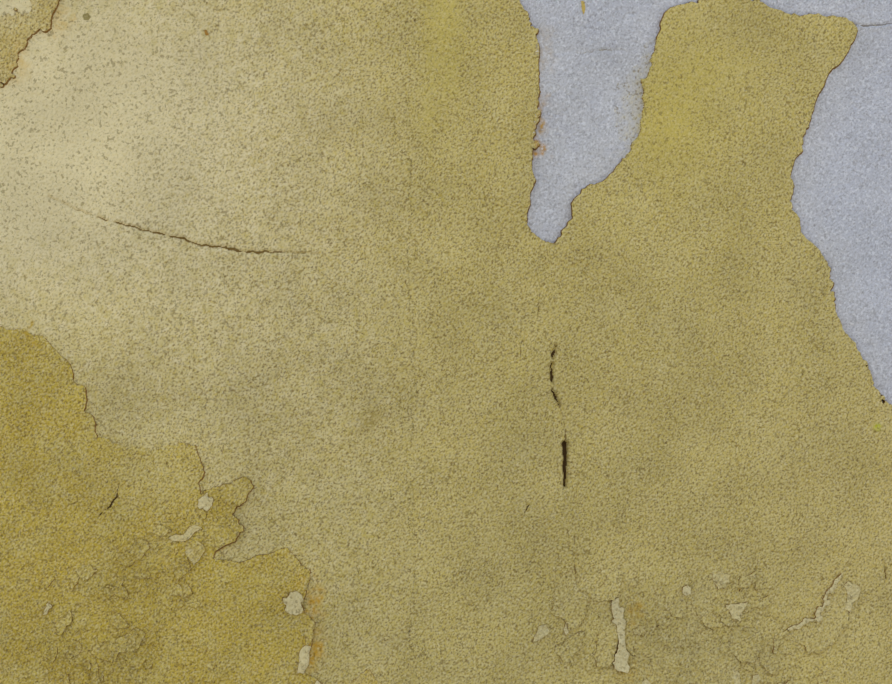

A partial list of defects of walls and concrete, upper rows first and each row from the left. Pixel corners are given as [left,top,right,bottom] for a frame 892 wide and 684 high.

flaking render [520,0,698,243]
crack [80,210,304,254]
flaking render [751,0,892,405]
peeling [0,0,420,684]
crack [550,345,560,407]
crack [560,430,568,487]
peeling [549,568,860,684]